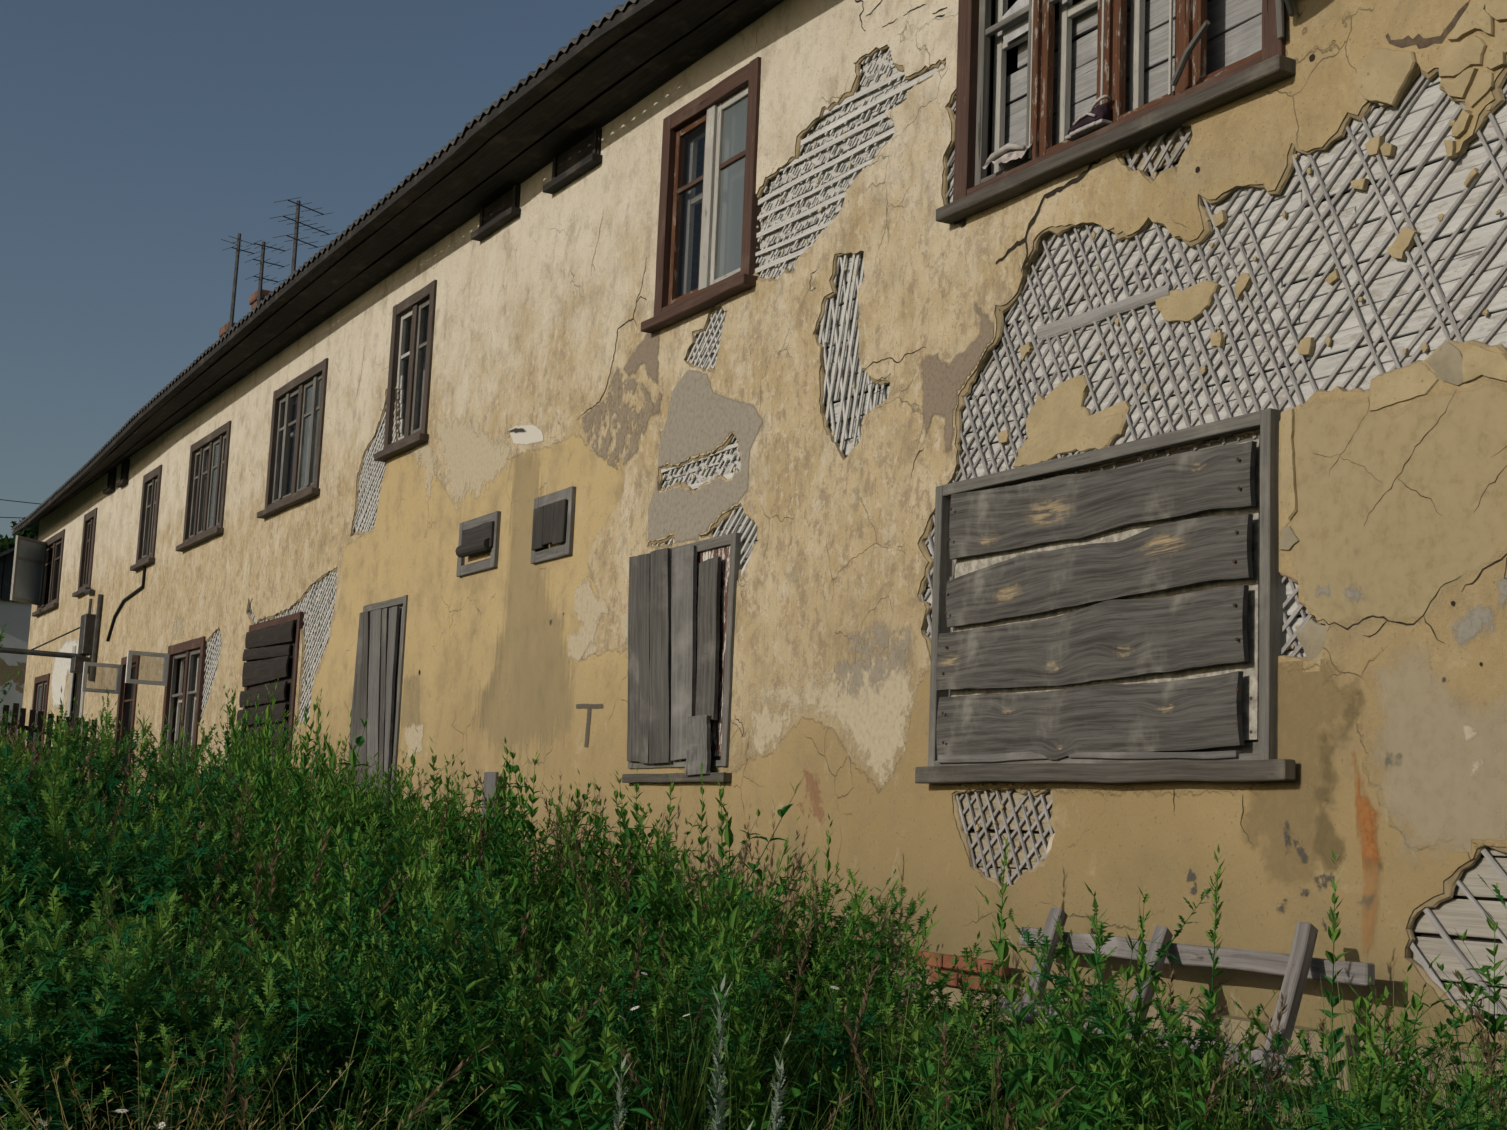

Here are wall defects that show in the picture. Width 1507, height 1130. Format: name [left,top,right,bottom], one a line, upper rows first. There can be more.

crack [1385,0,1470,49]
flaking render [582,307,762,575]
flaking render [755,48,946,279]
flaking render [818,253,890,457]
crack [995,159,1101,271]
flaking render [921,71,1507,486]
crack [1314,395,1507,525]
crack [1312,554,1507,643]
flaking render [956,789,1055,886]
leakage [1245,660,1353,880]
corrosion [1356,778,1378,947]
flaking render [1410,847,1507,1030]